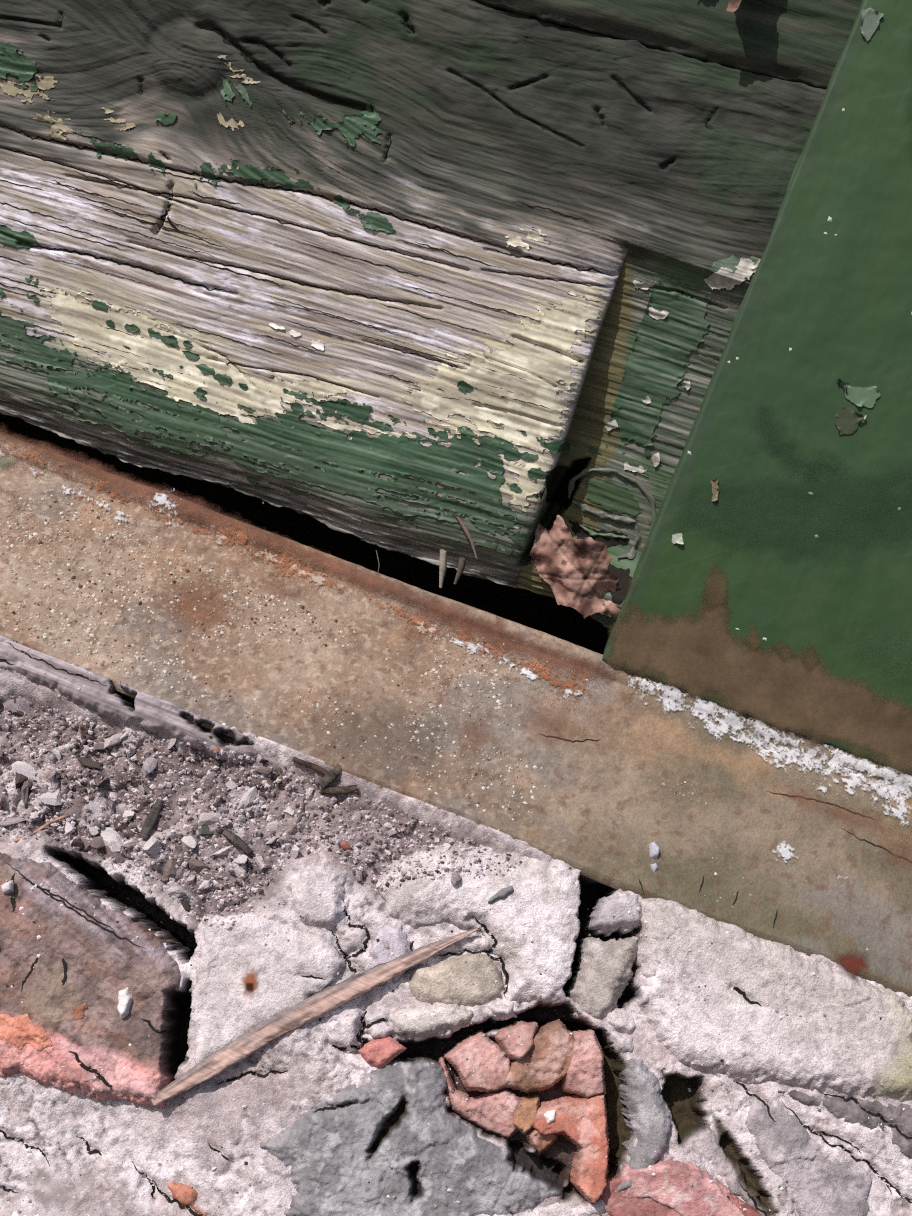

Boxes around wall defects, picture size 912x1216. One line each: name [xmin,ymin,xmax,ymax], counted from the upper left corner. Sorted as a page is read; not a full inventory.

peeling [834,379,881,435]
peeling [149,493,180,525]
peeling [672,533,684,544]
corrosion [0,432,602,702]
peeling [450,637,537,679]
peeling [628,677,912,826]
peeling [773,841,798,863]
spalling [117,987,133,1019]
crack [0,1130,50,1166]
crack [79,1137,102,1156]
crack [734,1081,912,1203]
crack [132,1162,203,1216]